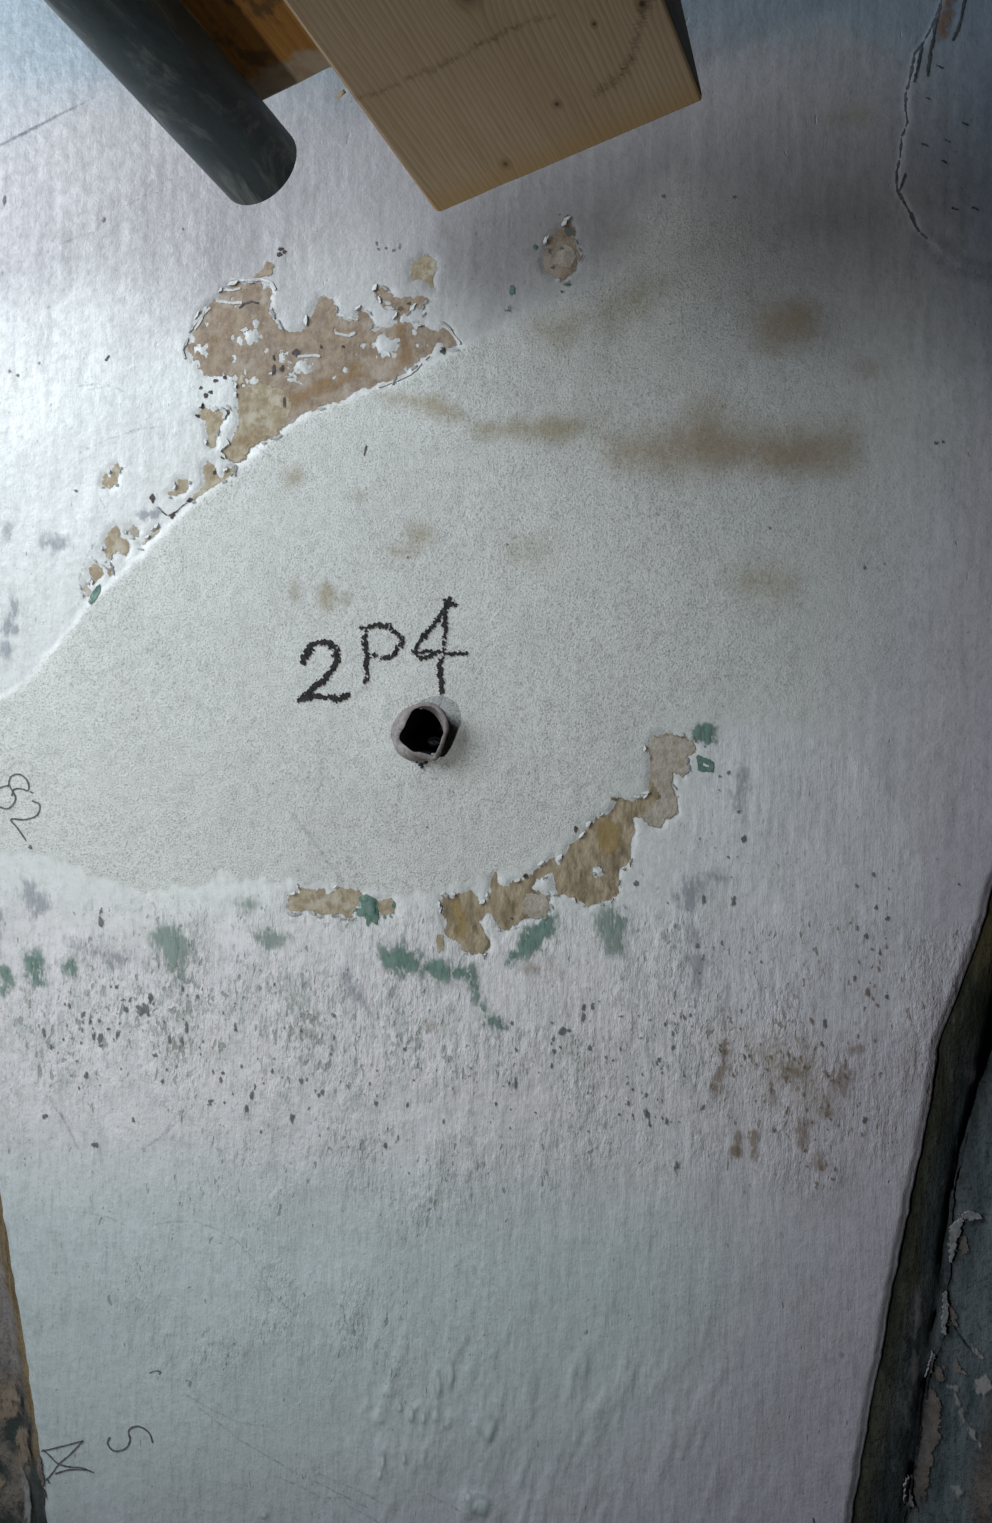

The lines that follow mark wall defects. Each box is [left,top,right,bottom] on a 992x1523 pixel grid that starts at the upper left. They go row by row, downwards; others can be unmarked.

crack [895,0,968,259]
spalling [532,215,584,293]
peeling [78,247,461,605]
peeling [286,884,395,926]
peeling [435,732,697,959]
peeling [947,1336,992,1448]